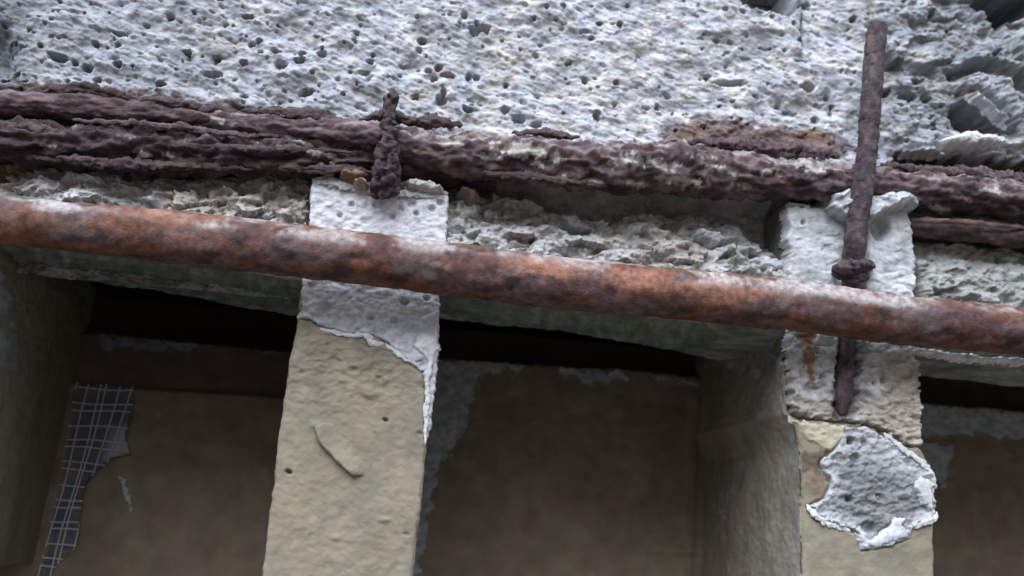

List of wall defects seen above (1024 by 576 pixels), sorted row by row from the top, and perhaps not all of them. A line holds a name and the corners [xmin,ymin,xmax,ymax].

spalling [0,161,845,286]
corrosion [0,81,1024,417]
spalling [860,210,1024,308]
spalling [896,131,1007,161]
flaking render [40,383,133,576]
flaking render [297,278,526,576]
peeling [558,366,629,388]
spalling [780,330,1024,550]